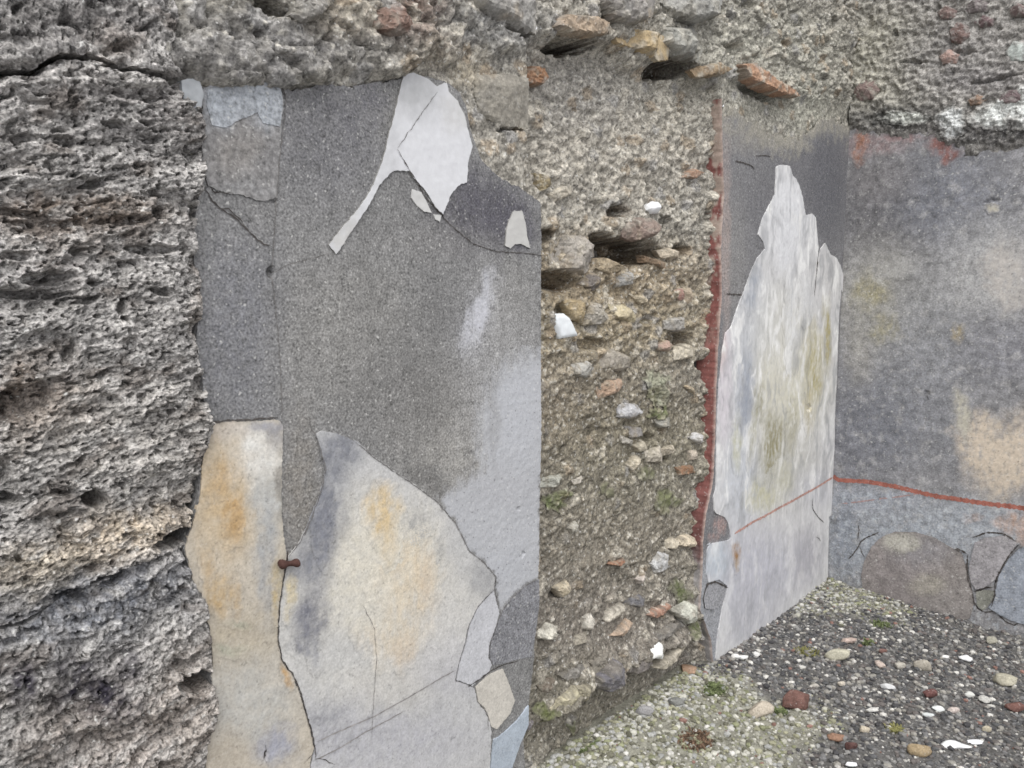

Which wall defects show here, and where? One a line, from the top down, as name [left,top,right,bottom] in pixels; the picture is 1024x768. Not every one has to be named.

flaking render [328,72,473,255]
flaking render [504,210,530,249]
crack [278,419,335,765]
crack [359,445,538,730]
spalling [703,583,727,610]
crack [849,525,879,559]
crack [955,532,1019,626]